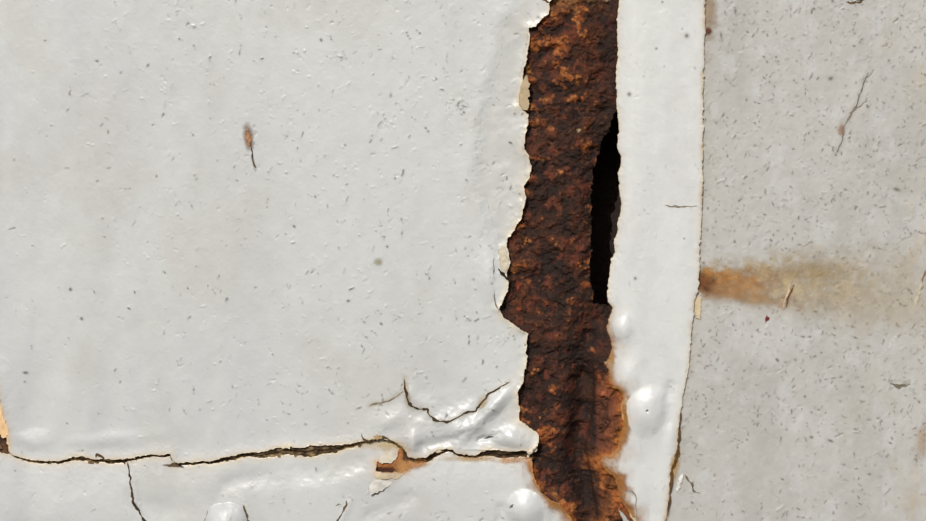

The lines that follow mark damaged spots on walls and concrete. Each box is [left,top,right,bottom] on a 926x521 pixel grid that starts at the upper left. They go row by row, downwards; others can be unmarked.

corrosion [244,127,256,167]
corrosion [499,0,639,521]
corrosion [694,263,834,319]
crack [370,380,509,423]
peeling [0,406,10,454]
crack [15,433,538,521]
spalling [369,447,409,495]